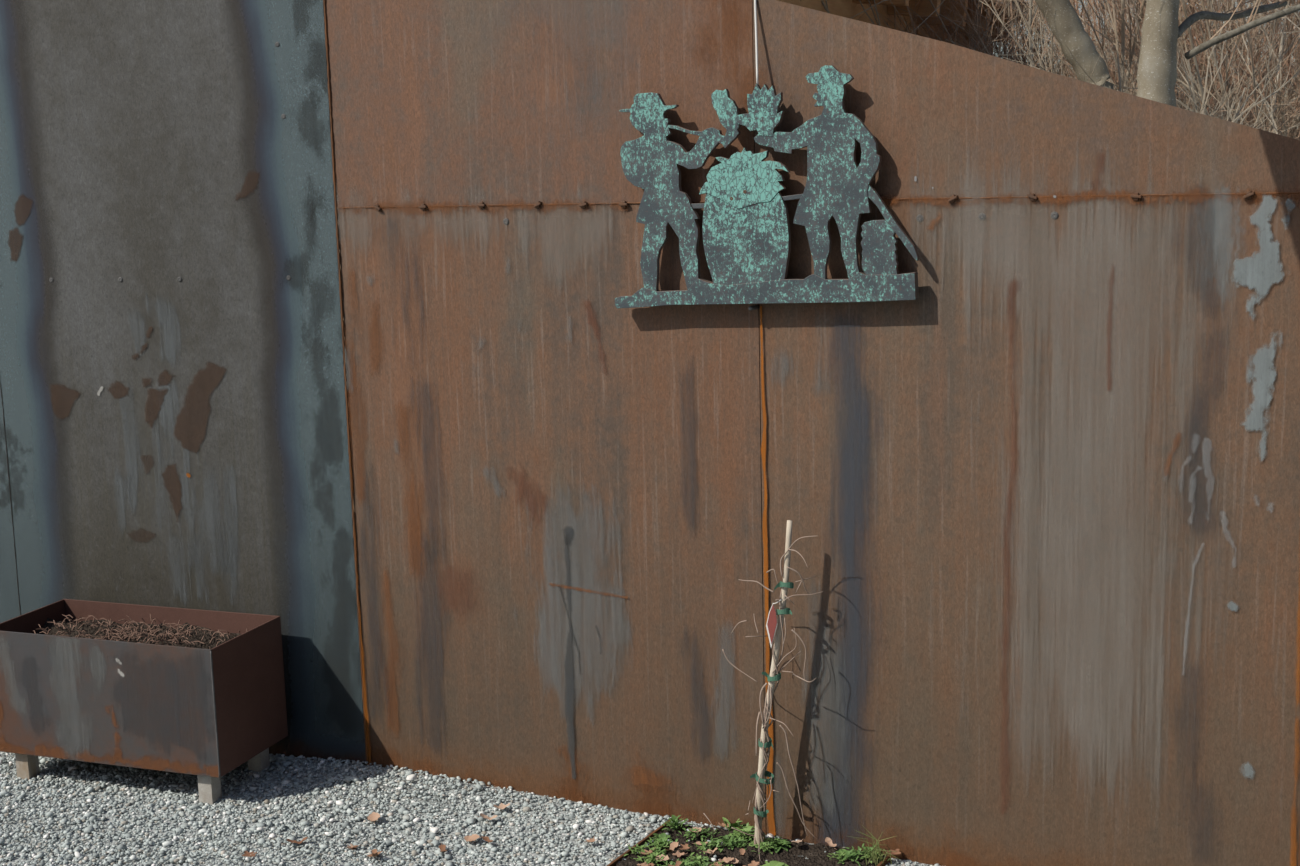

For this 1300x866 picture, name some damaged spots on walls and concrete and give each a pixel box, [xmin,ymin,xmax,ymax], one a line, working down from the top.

corrosion [1034,190,1203,205]
peeling [1234,196,1295,317]
corrosion [51,384,80,419]
corrosion [109,370,172,427]
corrosion [174,362,226,453]
peeling [1243,338,1276,461]
corrosion [162,464,191,517]
corrosion [760,306,770,693]
corrosion [359,609,400,769]
leakage [539,506,628,779]
corrosion [556,778,595,805]
corrosion [767,709,776,837]